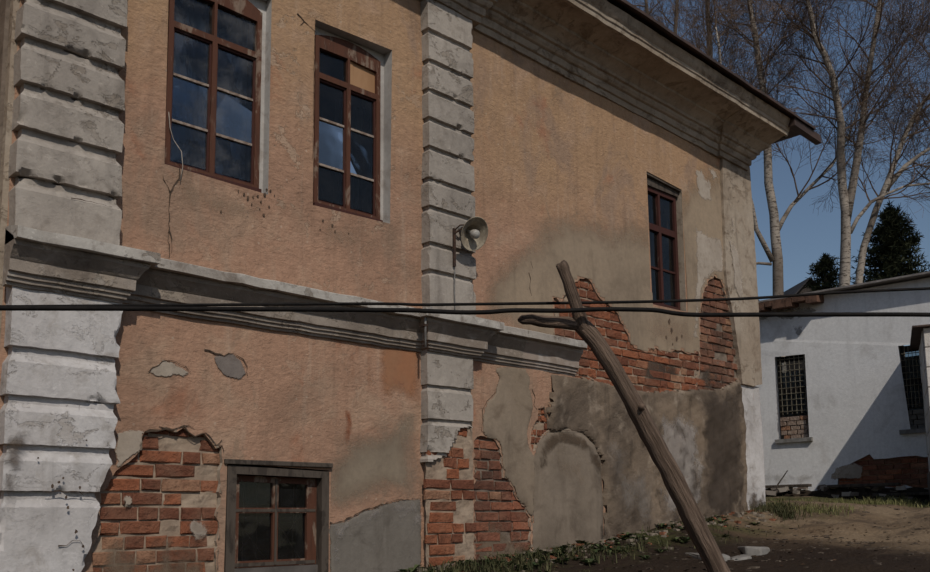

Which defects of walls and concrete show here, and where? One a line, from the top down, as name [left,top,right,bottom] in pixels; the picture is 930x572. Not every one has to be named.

crack [163,168,181,257]
peeling [696,170,716,200]
flaking render [553,294,572,317]
flaking render [575,230,738,393]
peeling [148,360,188,377]
peeling [204,349,248,379]
flaking render [554,328,614,386]
flaking render [82,427,223,572]
flaking render [423,367,551,568]
leakage [691,370,763,514]
flaking render [831,454,929,488]